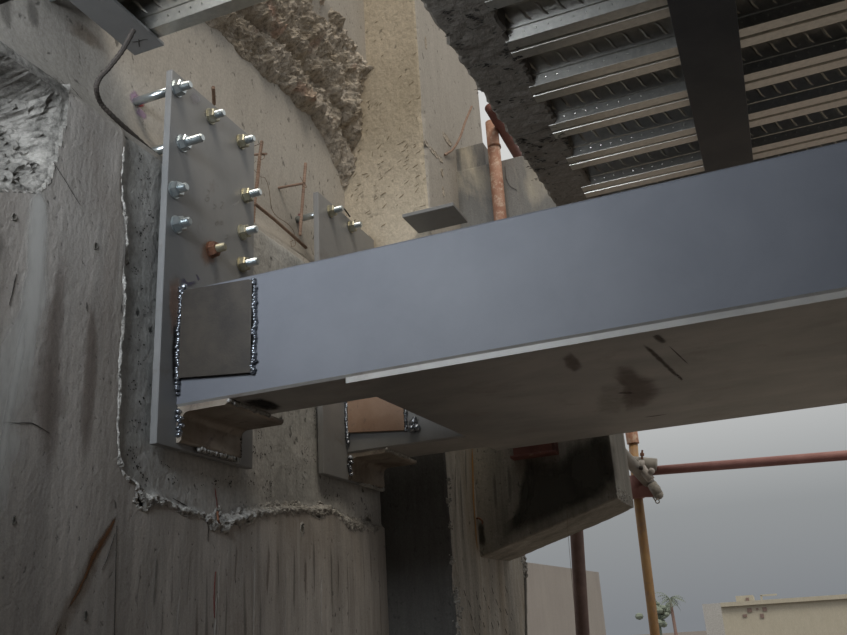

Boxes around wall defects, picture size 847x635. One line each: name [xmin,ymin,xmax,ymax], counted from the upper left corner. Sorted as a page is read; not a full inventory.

spalling [0,41,71,194]
spalling [94,28,158,154]
spalling [205,0,373,191]
spalling [116,140,381,536]
water stain [513,437,615,527]